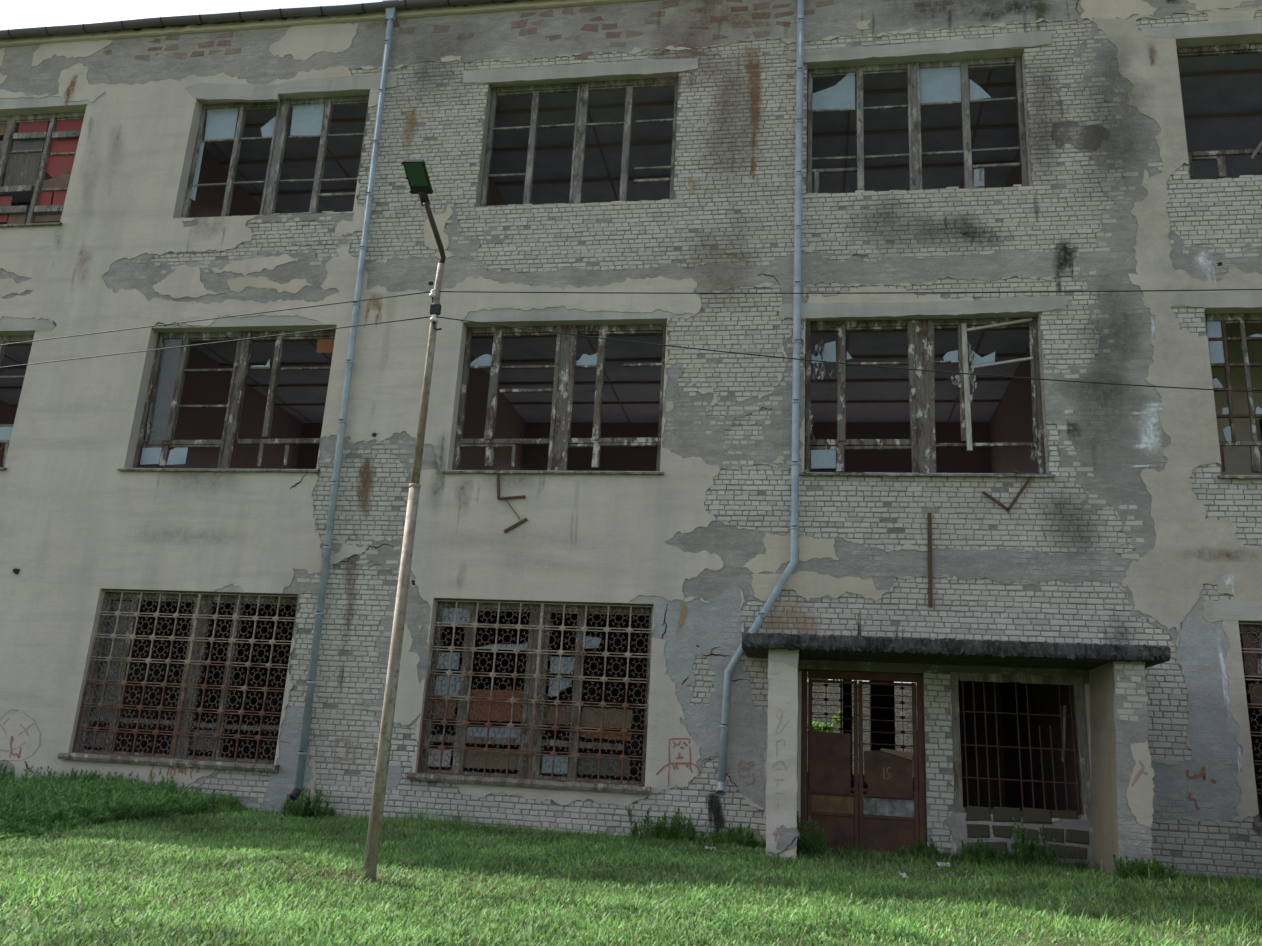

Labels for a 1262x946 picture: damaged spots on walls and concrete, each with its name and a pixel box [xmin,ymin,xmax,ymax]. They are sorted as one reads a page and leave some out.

rust [747,51,760,178]
rust [358,461,372,509]
flaking render [0,8,797,627]
flaking render [758,0,1262,762]
water stain [1056,243,1074,291]
water stain [1133,403,1163,467]
flaking render [283,431,799,859]